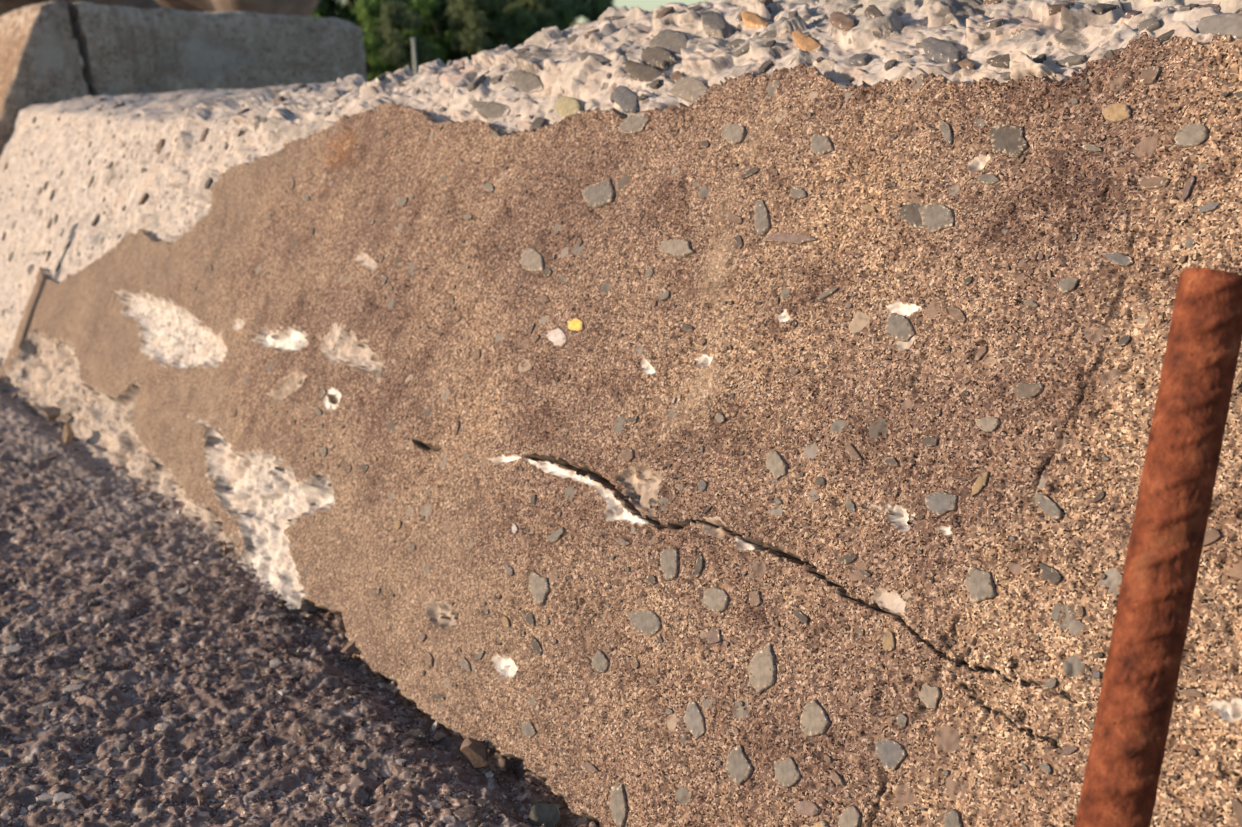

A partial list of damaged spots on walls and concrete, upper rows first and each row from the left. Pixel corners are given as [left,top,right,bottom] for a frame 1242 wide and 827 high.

crack [412,438,441,451]
spalling [0,0,1242,613]
crack [486,452,1073,753]